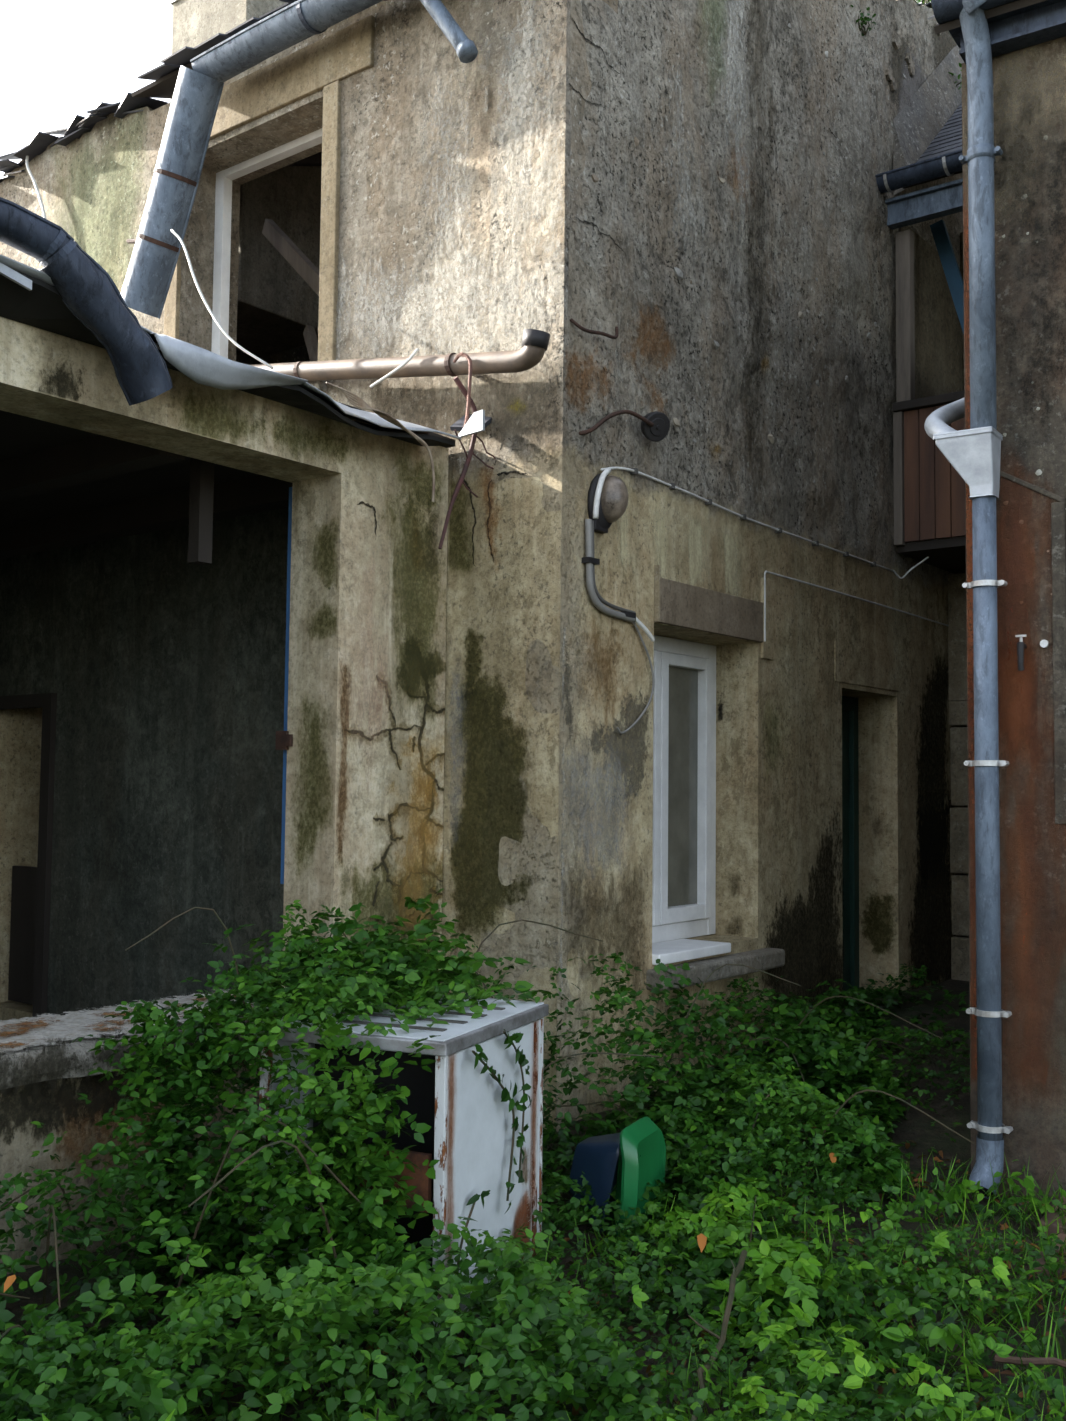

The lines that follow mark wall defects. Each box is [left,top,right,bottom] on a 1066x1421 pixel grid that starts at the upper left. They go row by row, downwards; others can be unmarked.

water stain [396,466,443,692]
rust [997,483,1034,744]
water stain [299,705,329,860]
crack [344,647,445,920]
water stain [452,632,525,927]
water stain [762,818,844,1005]
water stain [908,657,954,989]